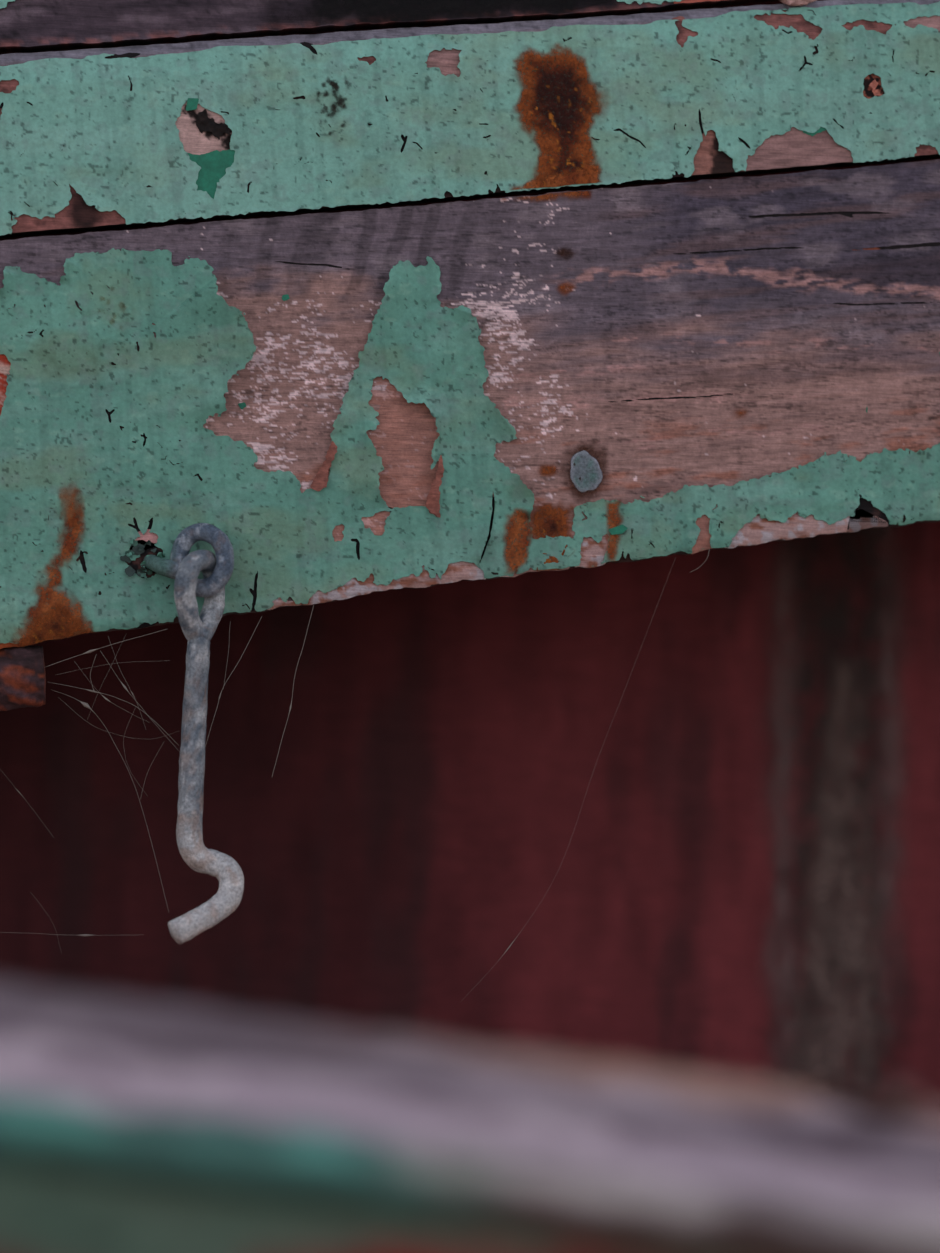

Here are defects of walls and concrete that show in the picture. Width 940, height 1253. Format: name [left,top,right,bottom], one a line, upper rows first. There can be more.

peeling [671,0,720,48]
peeling [754,11,823,40]
peeling [842,16,940,34]
peeling [0,79,19,94]
peeling [425,48,462,77]
hole [863,74,885,99]
spalling [175,98,235,199]
rust [512,45,601,201]
peeling [0,127,940,610]
rust [505,445,606,572]
rust [607,501,628,560]
rust [0,492,92,711]